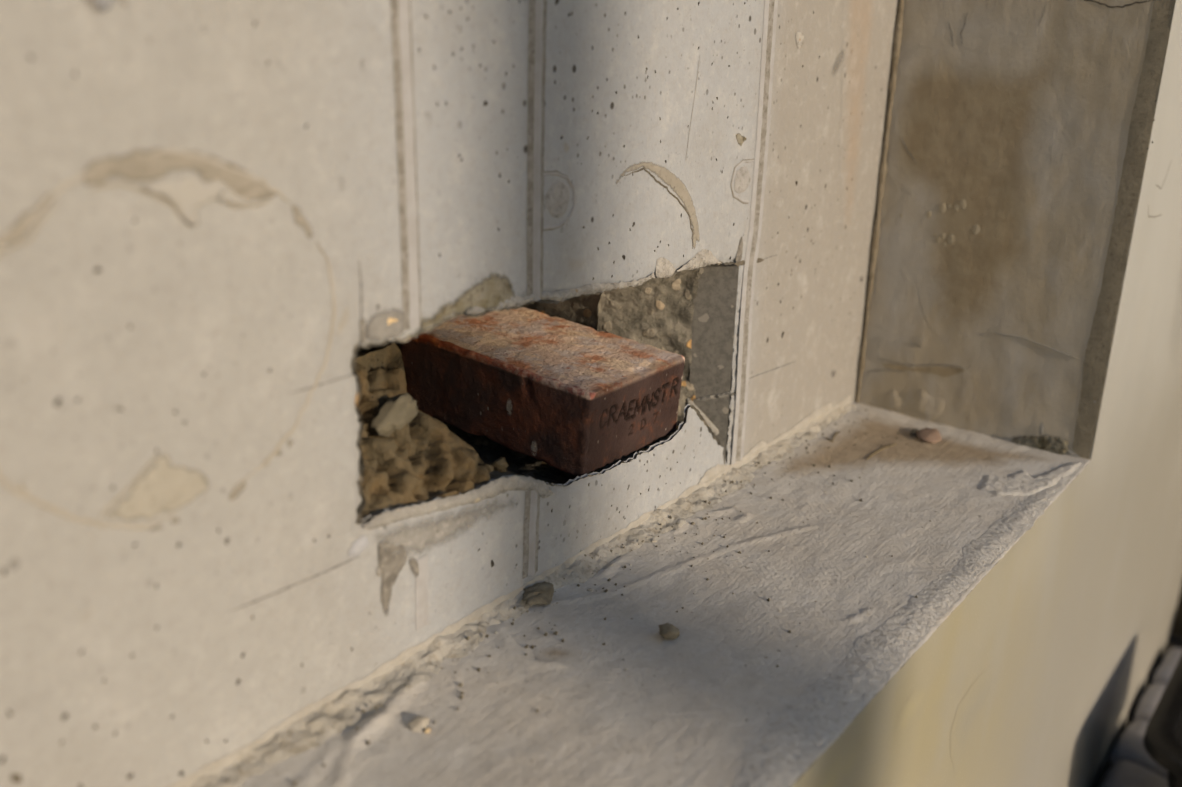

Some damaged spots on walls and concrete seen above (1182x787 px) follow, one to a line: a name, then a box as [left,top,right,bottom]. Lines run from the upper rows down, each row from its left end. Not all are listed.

leakage [862,0,1076,345]
crack [1085,0,1151,8]
spalling [348,162,734,613]